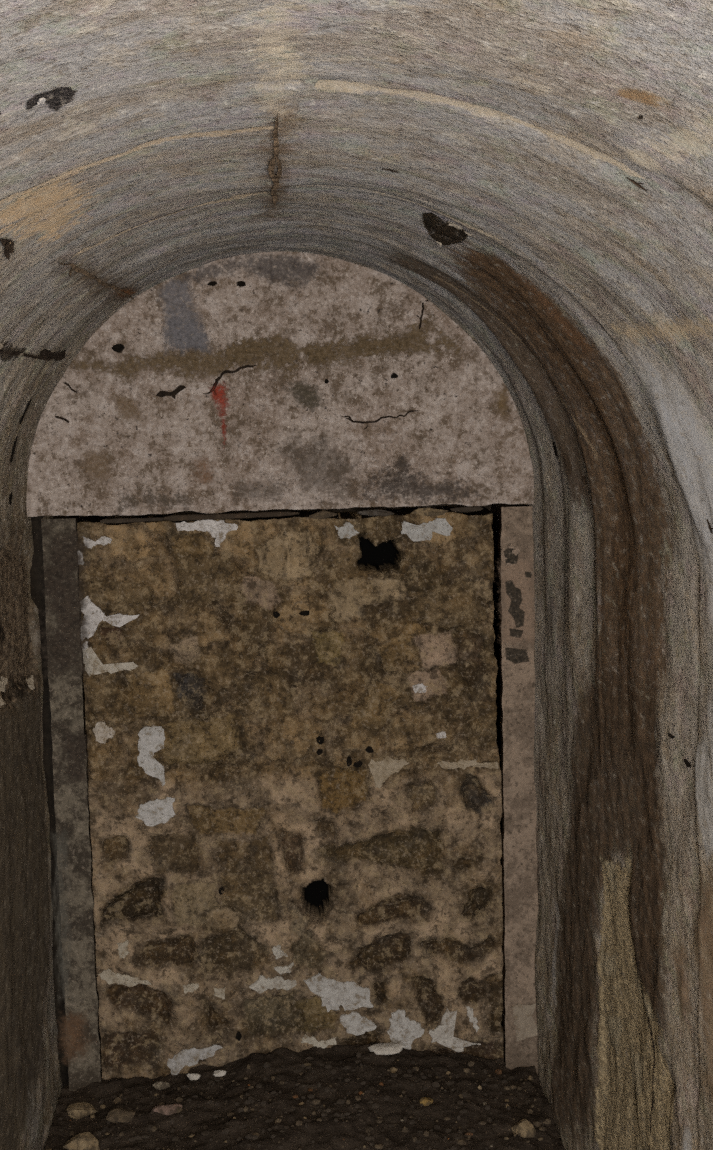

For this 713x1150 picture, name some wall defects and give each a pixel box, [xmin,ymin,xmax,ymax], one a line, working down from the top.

spalling [26,87,78,111]
crack [268,115,284,205]
spalling [423,213,472,246]
crack [0,343,77,393]
spalling [0,518,41,718]
peeling [183,983,199,994]
peeling [214,987,226,999]
peeling [321,994,377,1036]